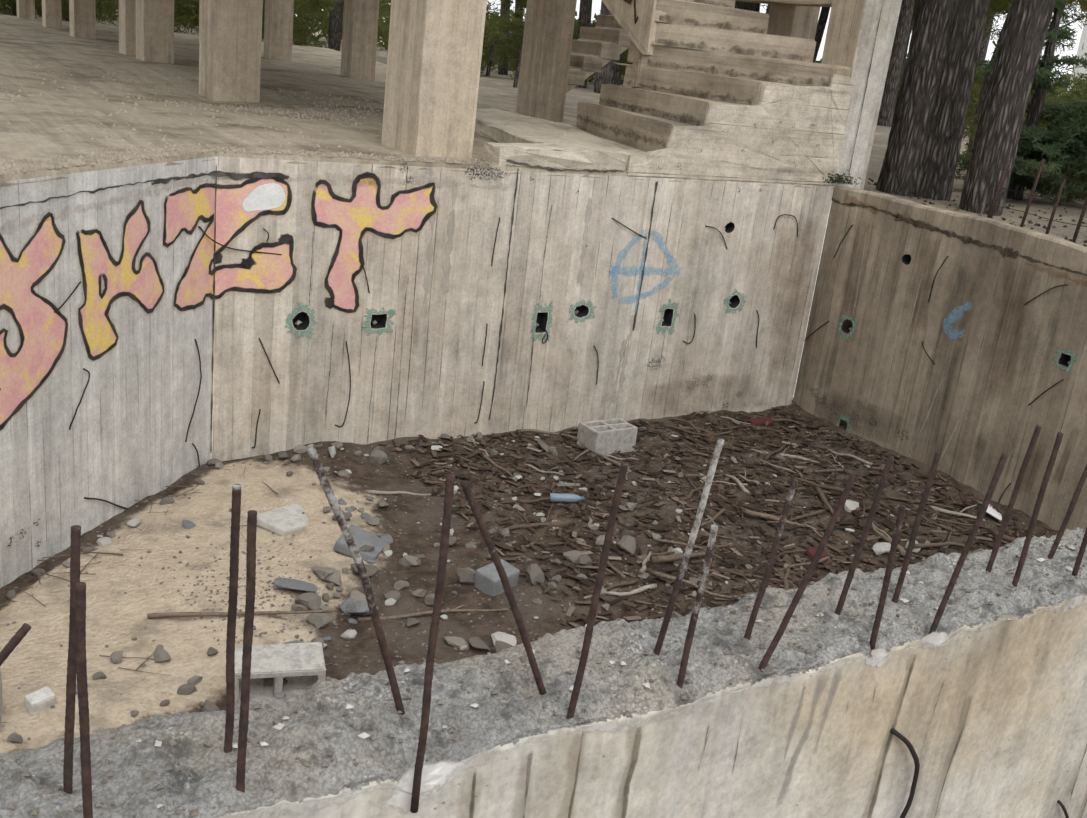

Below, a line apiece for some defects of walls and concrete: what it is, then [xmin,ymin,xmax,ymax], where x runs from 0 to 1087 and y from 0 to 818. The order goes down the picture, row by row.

crack [832,0,1087,276]
crack [0,166,289,453]
spalling [0,623,31,666]
spalling [63,525,93,818]
spalling [224,484,257,792]
spalling [306,444,410,715]
spalling [386,473,546,813]
spalling [566,461,629,719]
spalling [642,438,724,689]
spalling [758,474,857,670]
spalling [870,451,941,667]
spalling [922,453,1008,648]